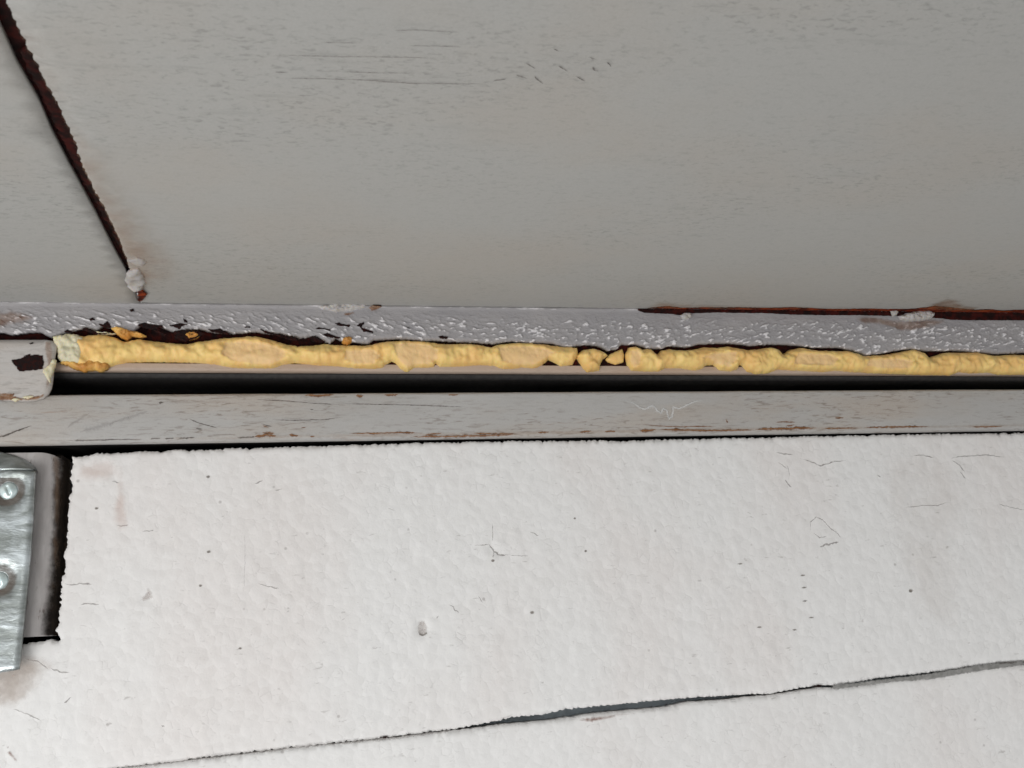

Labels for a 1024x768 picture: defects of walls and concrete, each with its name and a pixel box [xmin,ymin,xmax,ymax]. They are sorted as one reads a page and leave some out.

corrosion [638,306,1024,321]
peeling [64,318,231,342]
peeling [245,322,373,346]
crack [813,660,1024,689]
crack [124,730,448,768]